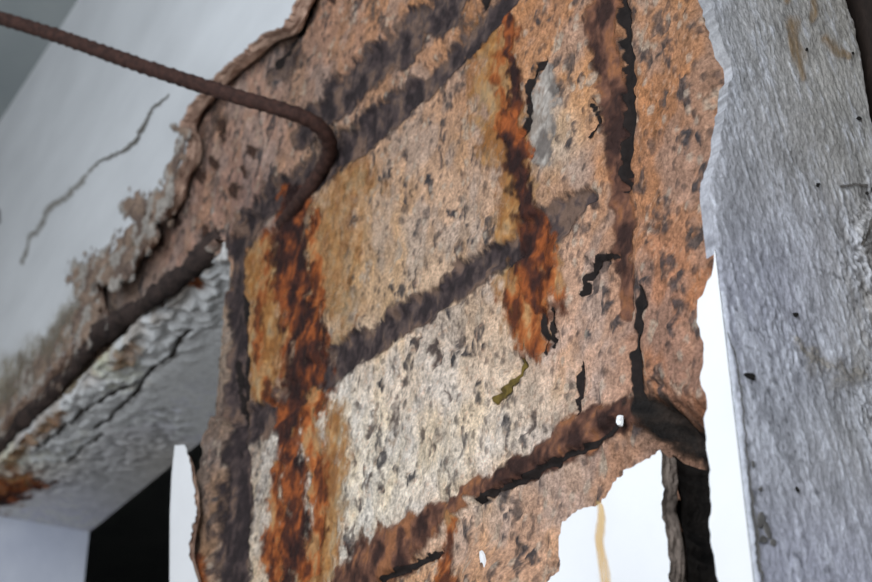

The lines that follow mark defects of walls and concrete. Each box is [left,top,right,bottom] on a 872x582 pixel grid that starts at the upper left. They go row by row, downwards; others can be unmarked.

crack [21,94,169,264]
spalling [0,11,338,229]
spalling [0,123,224,454]
spalling [103,0,725,582]
spalling [0,472,59,506]
spalling [2,411,65,470]
crack [35,329,193,463]
crack [672,454,718,582]